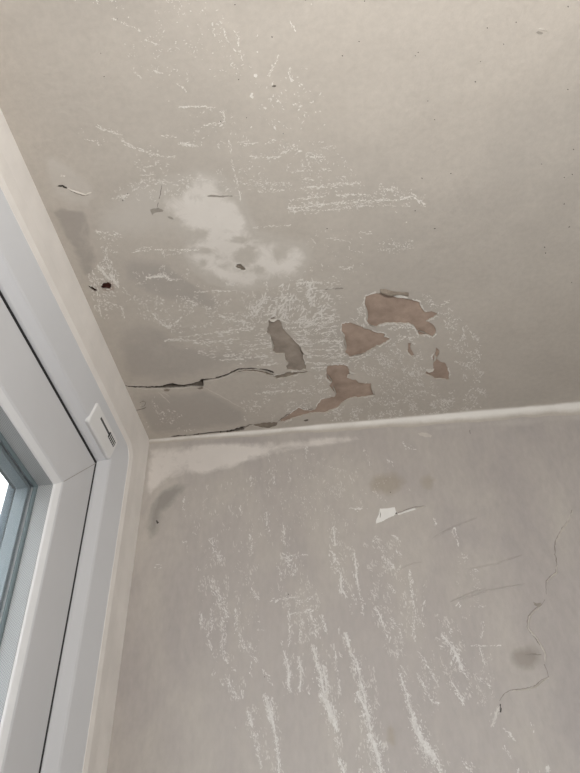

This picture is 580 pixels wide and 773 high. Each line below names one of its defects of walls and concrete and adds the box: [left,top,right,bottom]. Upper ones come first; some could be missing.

leakage [38,124,440,544]
peeling [267,316,310,379]
peeling [281,289,437,422]
peeling [426,348,451,379]
crack [126,368,311,433]
flaking render [376,506,426,524]
crack [499,510,573,713]